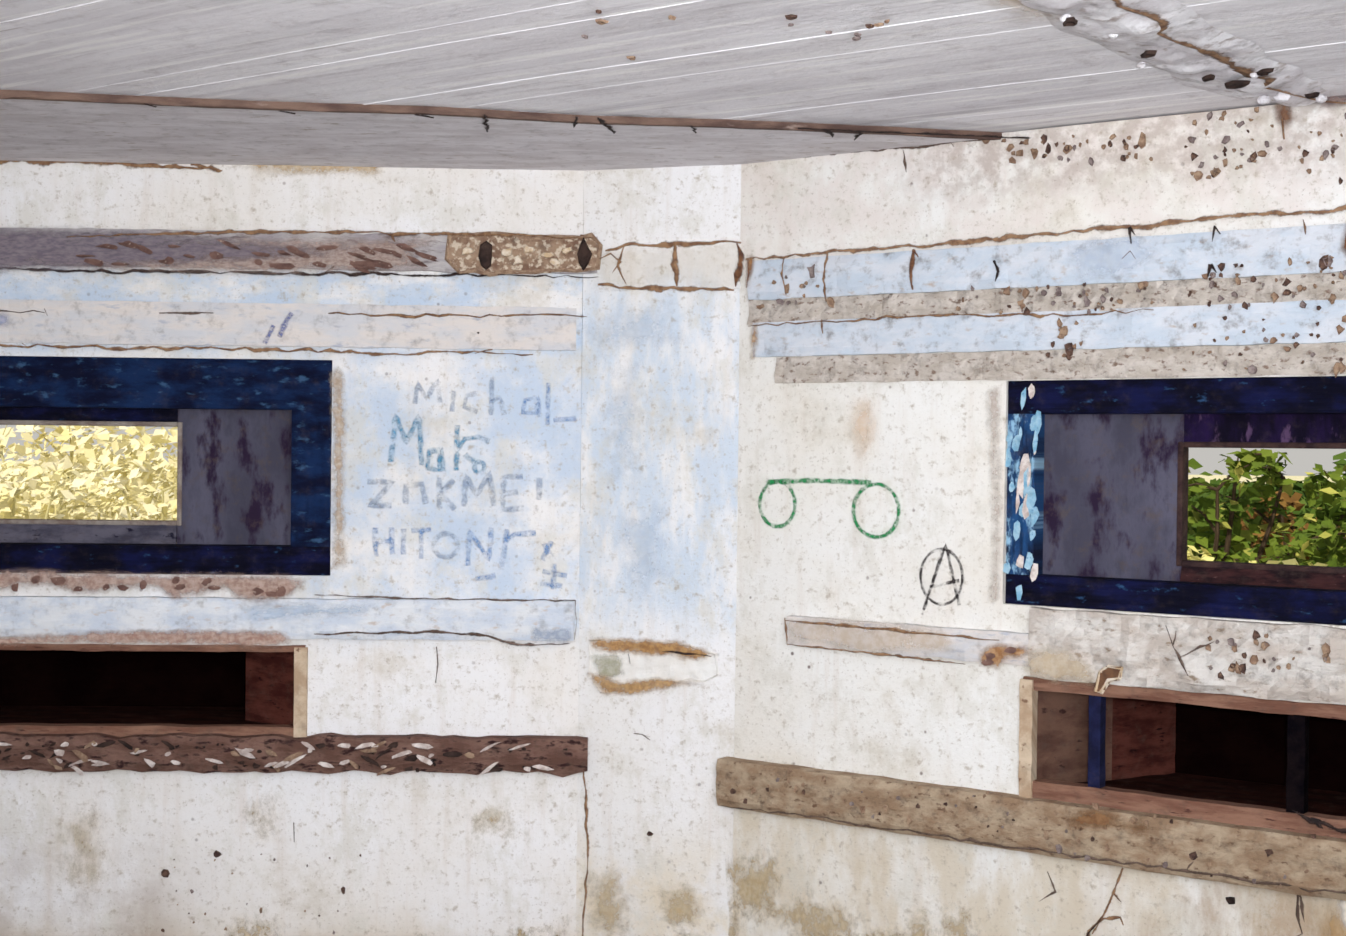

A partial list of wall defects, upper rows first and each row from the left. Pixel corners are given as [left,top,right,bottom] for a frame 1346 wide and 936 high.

corrosion [1276,104,1292,140]
crack [745,205,1346,334]
spalling [588,638,719,694]
peeling [0,740,180,776]
peeling [196,741,554,776]
leakage [727,860,850,936]
crack [721,805,1346,936]